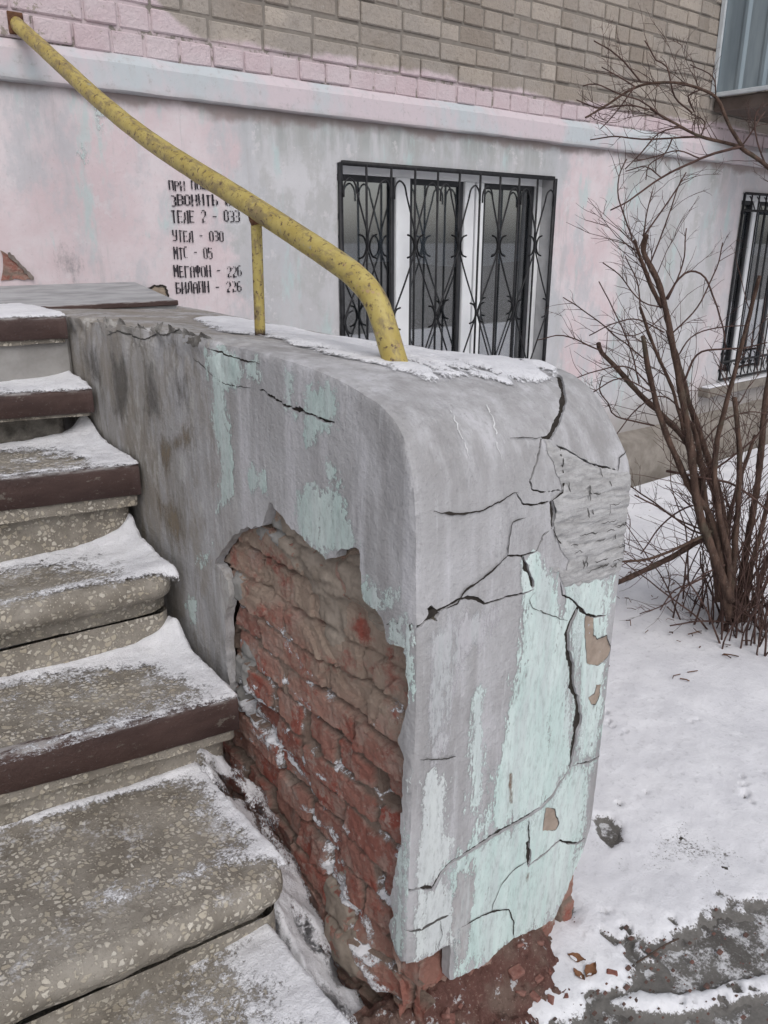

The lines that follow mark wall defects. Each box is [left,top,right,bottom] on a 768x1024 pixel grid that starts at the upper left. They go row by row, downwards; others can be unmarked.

spalling [0,250,34,281]
crack [193,348,335,423]
peeling [282,367,341,449]
crack [387,376,626,766]
spalling [217,456,616,1024]
crack [404,801,545,950]